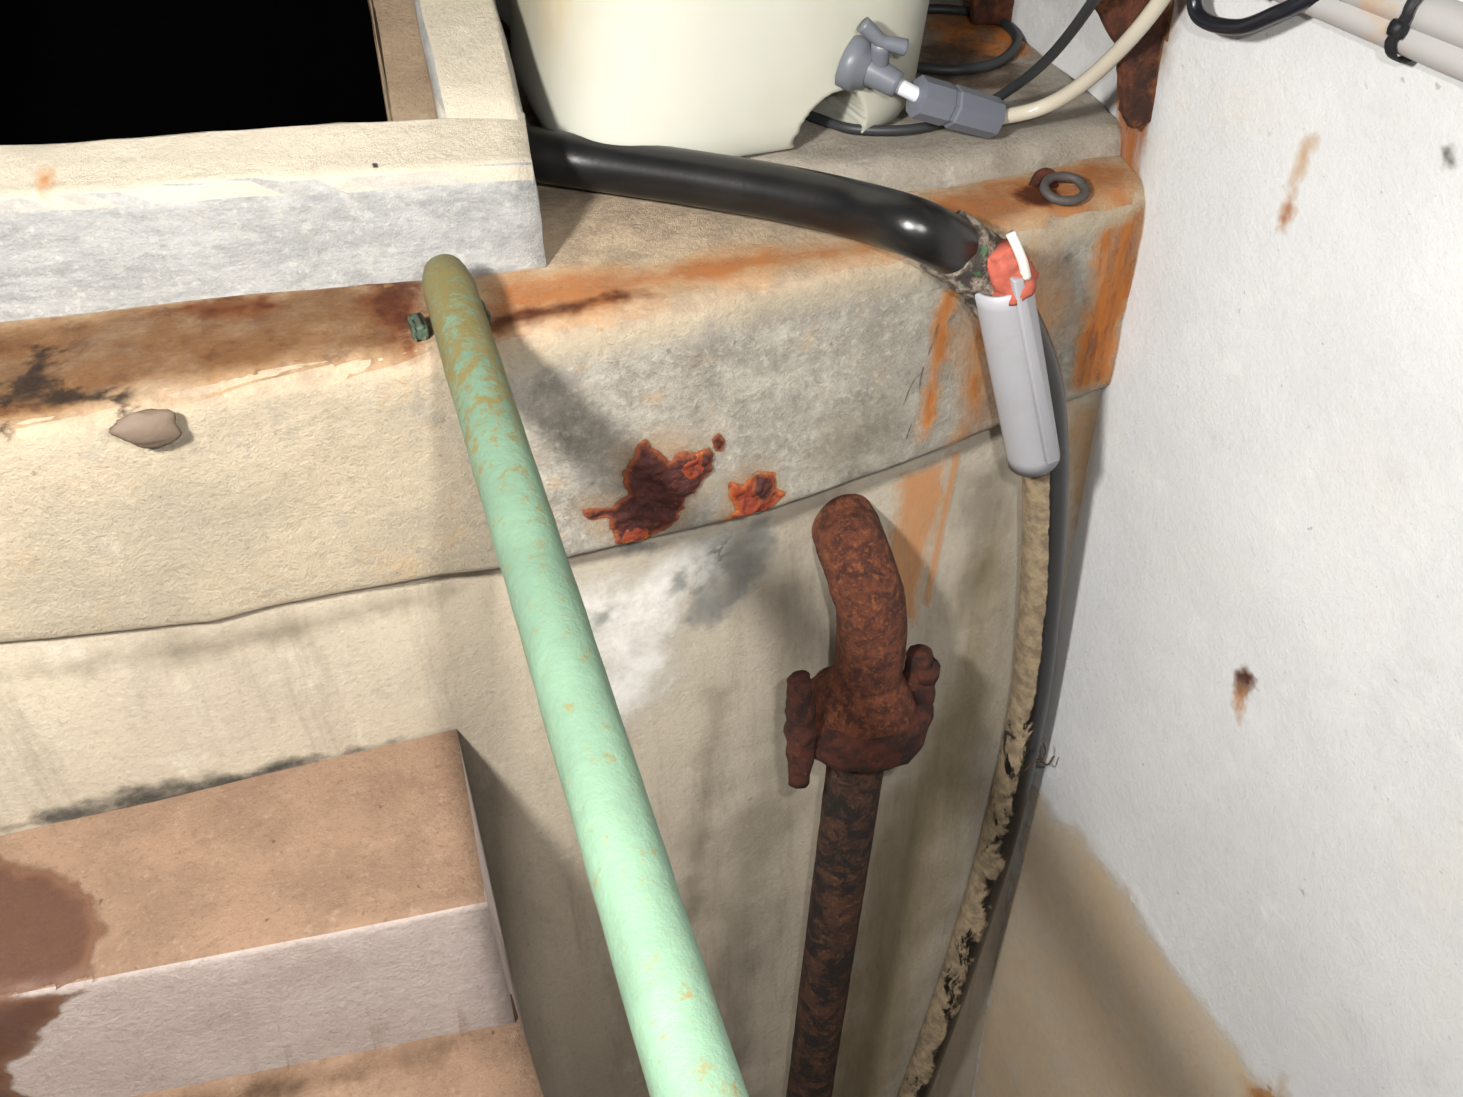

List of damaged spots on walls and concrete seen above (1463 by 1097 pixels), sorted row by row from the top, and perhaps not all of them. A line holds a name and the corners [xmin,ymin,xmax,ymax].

corrosion [929,98,1146,389]
corrosion [1281,203,1291,224]
corrosion [0,281,427,421]
corrosion [923,290,957,429]
corrosion [968,323,984,415]
corrosion [892,439,959,618]
leakage [580,534,730,716]
corrosion [1235,668,1253,709]
leakage [0,857,106,1097]